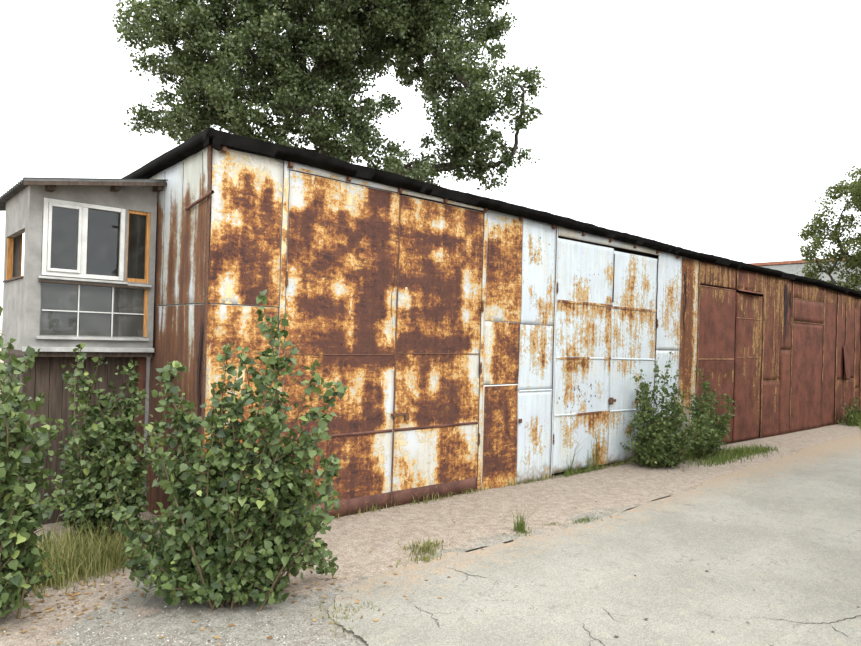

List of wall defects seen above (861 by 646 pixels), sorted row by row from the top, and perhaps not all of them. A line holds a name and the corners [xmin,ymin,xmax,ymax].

corrosion [146,150,860,527]